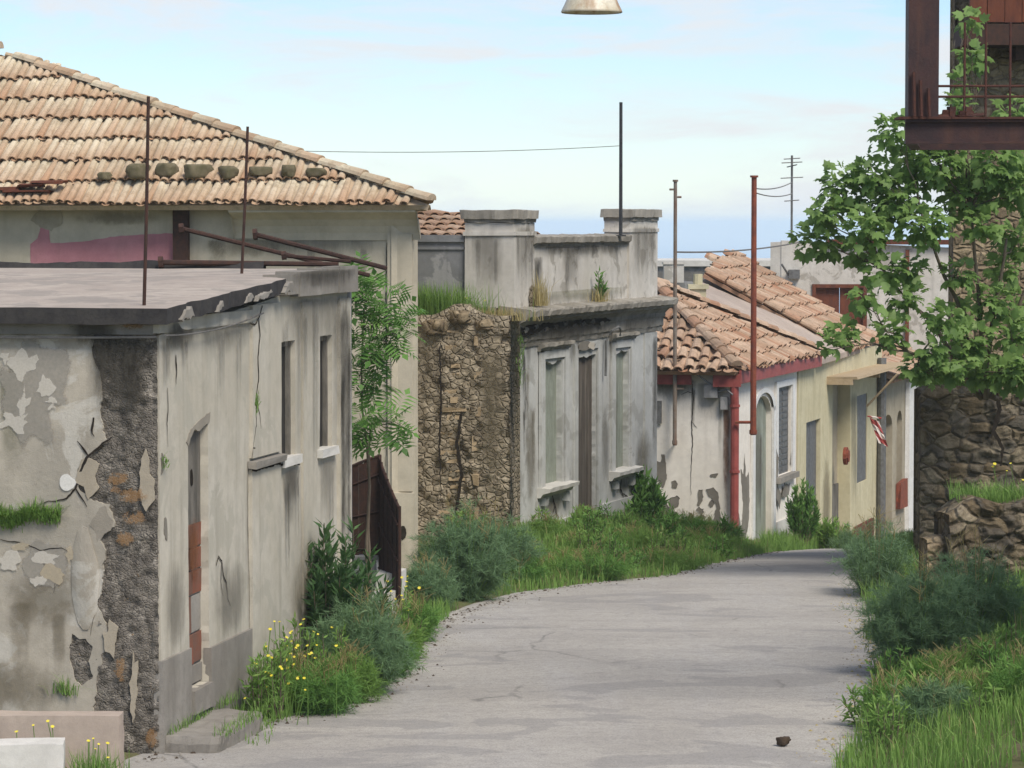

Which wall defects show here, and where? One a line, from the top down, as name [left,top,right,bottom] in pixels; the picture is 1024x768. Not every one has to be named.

rust [939,106,985,117]
spalling [178,306,195,322]
spalling [244,281,295,303]
peeling [0,339,70,444]
crack [251,306,300,472]
crack [44,417,112,507]
peeling [657,454,680,514]
peeling [691,473,721,523]
peeling [739,454,750,539]
flaking render [0,539,73,588]
spalling [60,334,168,754]
crack [216,542,250,622]